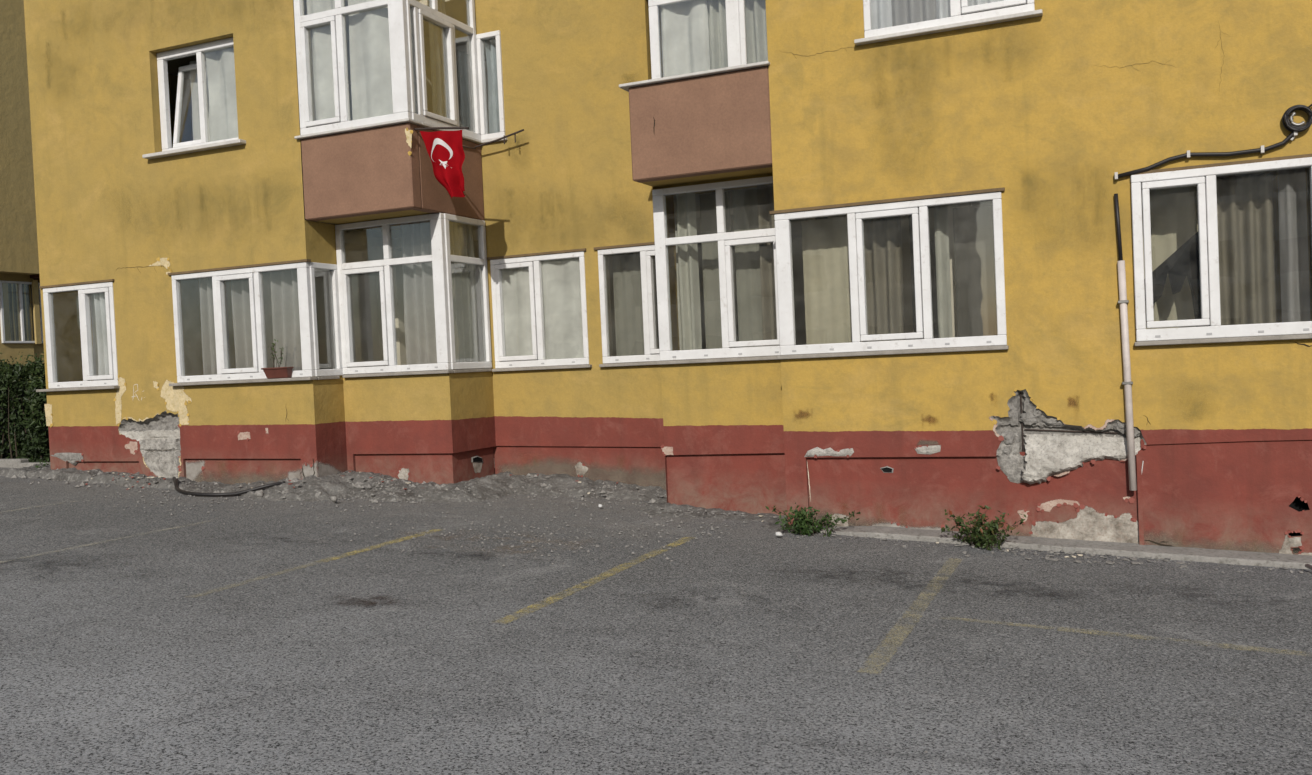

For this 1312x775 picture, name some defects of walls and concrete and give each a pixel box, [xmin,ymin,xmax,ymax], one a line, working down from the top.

spalling [114,375,192,478]
spalling [805,447,854,458]
spalling [914,441,941,454]
spalling [989,388,1147,485]
peeling [1017,496,1139,544]